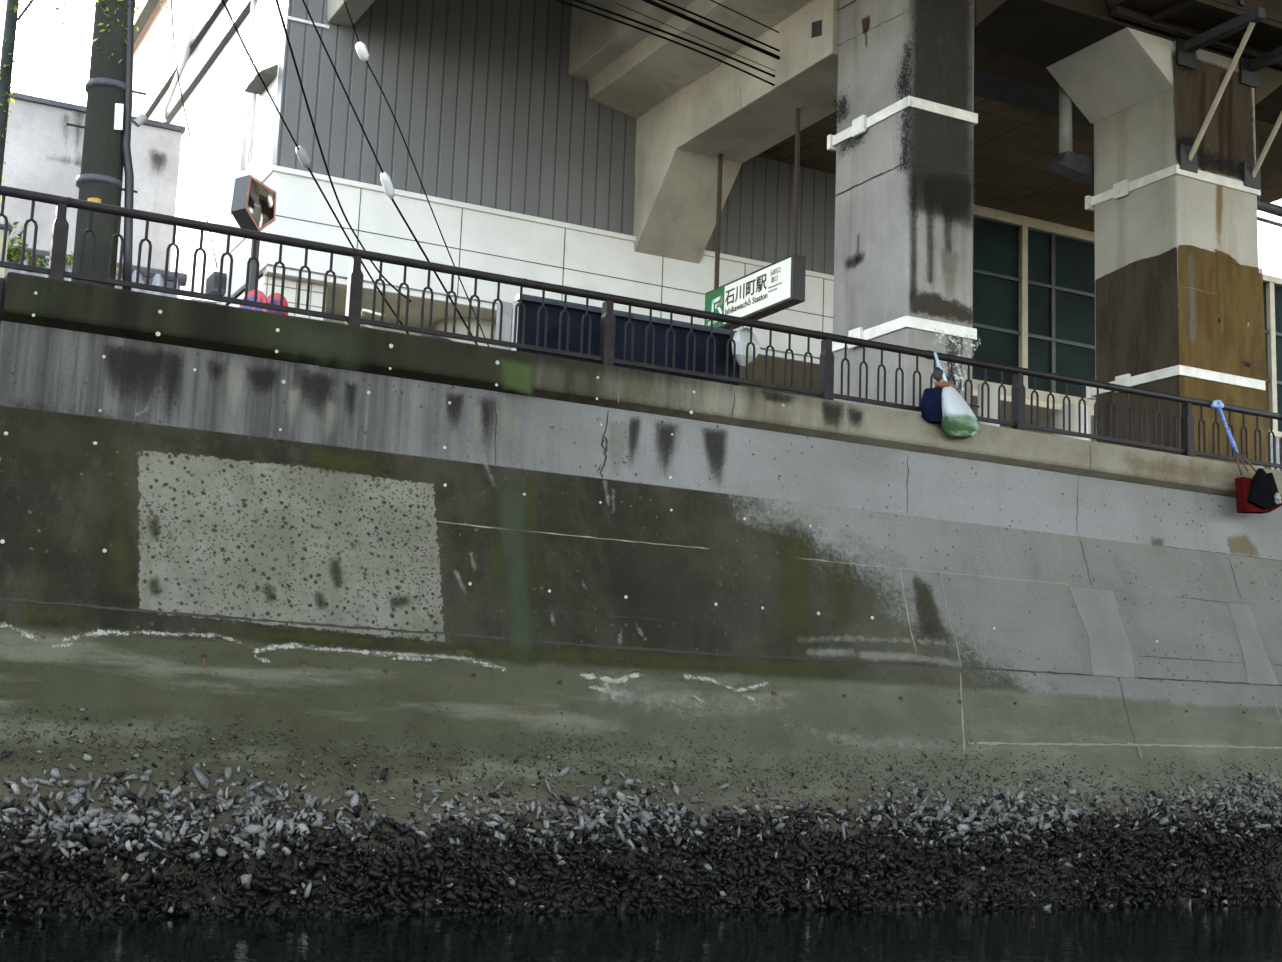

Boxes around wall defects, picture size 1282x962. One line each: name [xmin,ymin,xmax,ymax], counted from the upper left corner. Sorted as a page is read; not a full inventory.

leakage [107,346,181,399]
leakage [210,363,276,409]
leakage [289,372,356,425]
leakage [448,360,532,445]
leakage [613,420,639,457]
leakage [657,425,675,464]
leakage [705,430,725,476]
spalling [151,519,159,537]
spalling [331,561,342,587]
spalling [391,597,409,606]
crack [0,401,1282,757]